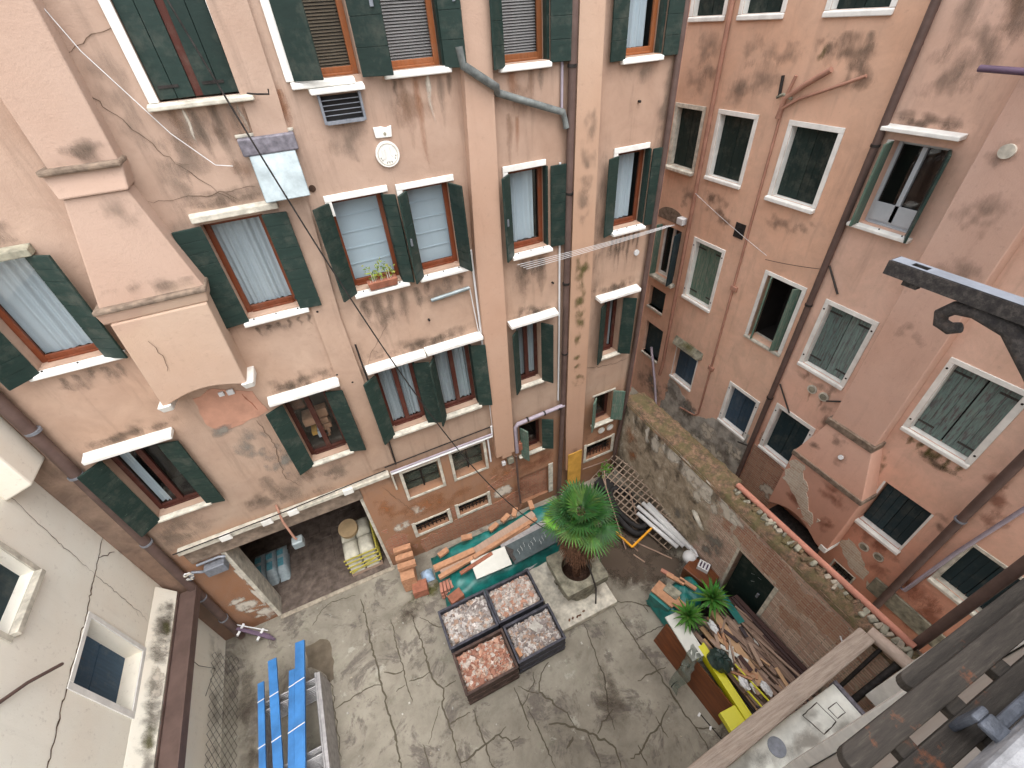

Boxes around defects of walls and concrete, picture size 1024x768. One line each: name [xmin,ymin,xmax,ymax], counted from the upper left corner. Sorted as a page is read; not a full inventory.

crack [92,97,255,203]
spalling [740,431,820,527]
spalling [840,538,870,587]
crack [12,498,142,768]
crack [313,595,722,768]